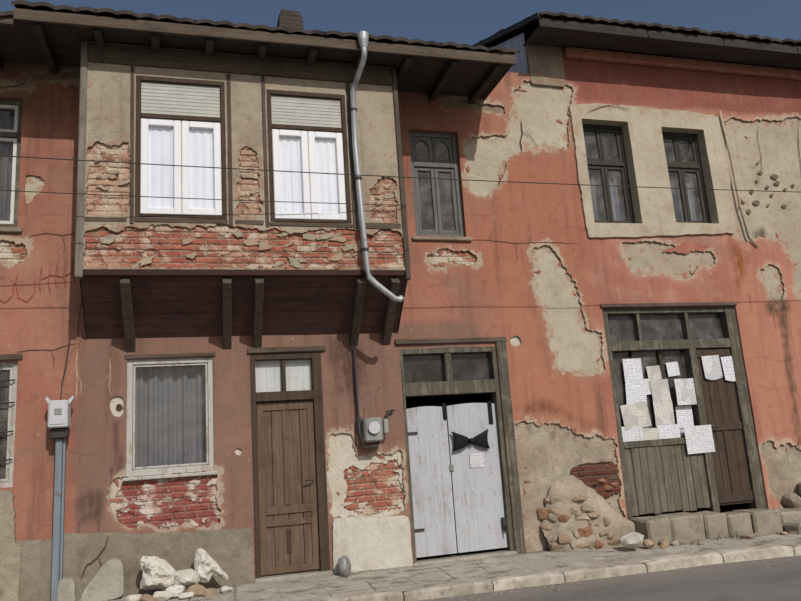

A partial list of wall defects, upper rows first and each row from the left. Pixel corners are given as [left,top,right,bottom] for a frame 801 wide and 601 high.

crack [28,233,76,254]
flaking render [86,142,130,216]
flaking render [84,177,404,270]
flaking render [237,147,263,217]
spalling [439,81,572,197]
crack [487,229,580,263]
spalling [724,117,801,296]
crack [20,300,82,401]
spalling [530,245,605,376]
spalling [110,471,221,530]
flaking render [327,433,405,518]
spalling [514,421,625,552]